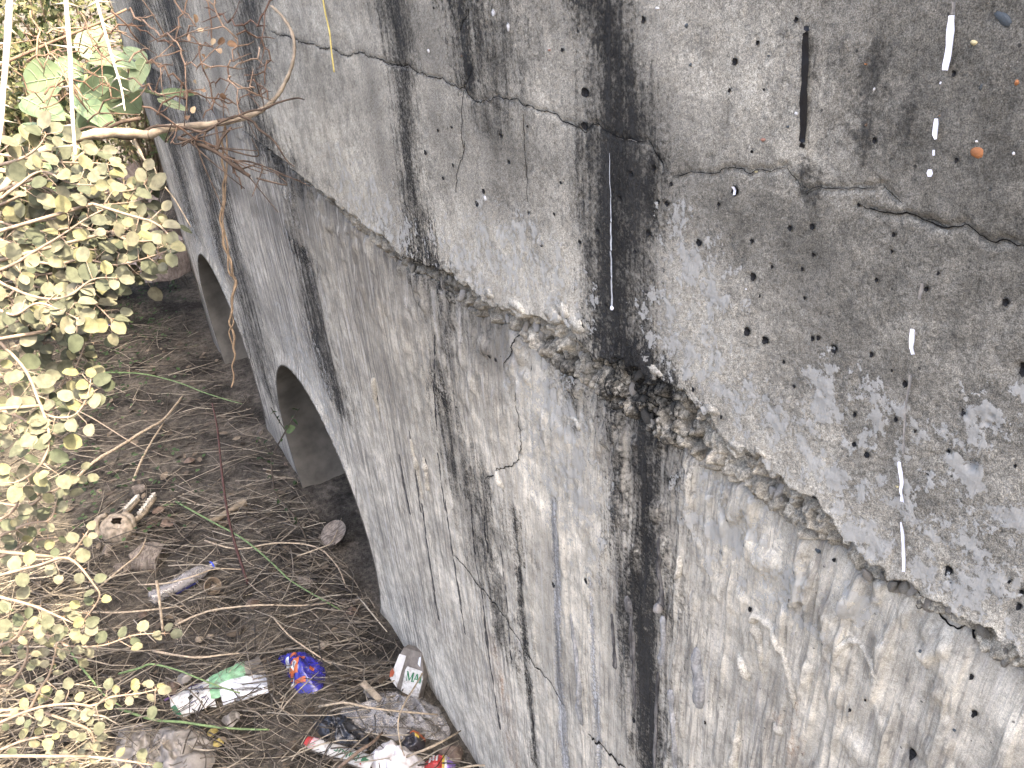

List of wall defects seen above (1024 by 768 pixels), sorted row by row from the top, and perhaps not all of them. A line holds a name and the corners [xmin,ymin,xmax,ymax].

crack [273,32,1024,246]
leakage [367,0,538,768]
crack [485,393,523,479]
leakage [538,0,701,768]
spalling [296,141,1024,668]
crack [454,555,563,704]
crack [589,735,626,768]